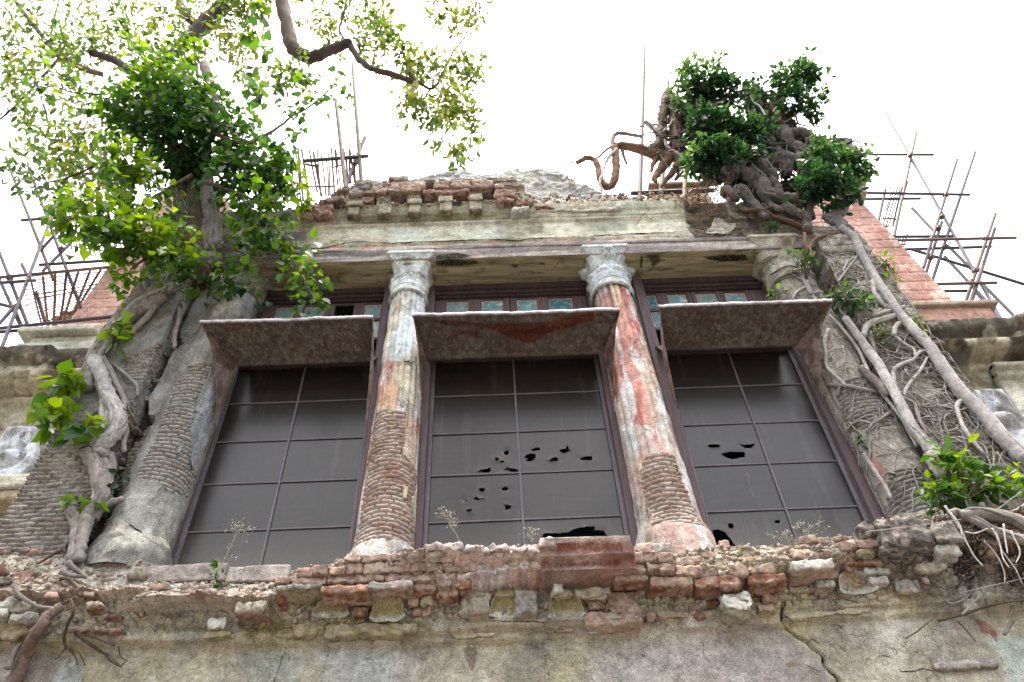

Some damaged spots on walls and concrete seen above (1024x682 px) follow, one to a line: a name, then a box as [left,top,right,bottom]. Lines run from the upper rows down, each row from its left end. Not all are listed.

spalling [352,410,418,550]
spalling [639,453,703,528]
peeling [786,607,872,622]
crack [780,601,939,682]